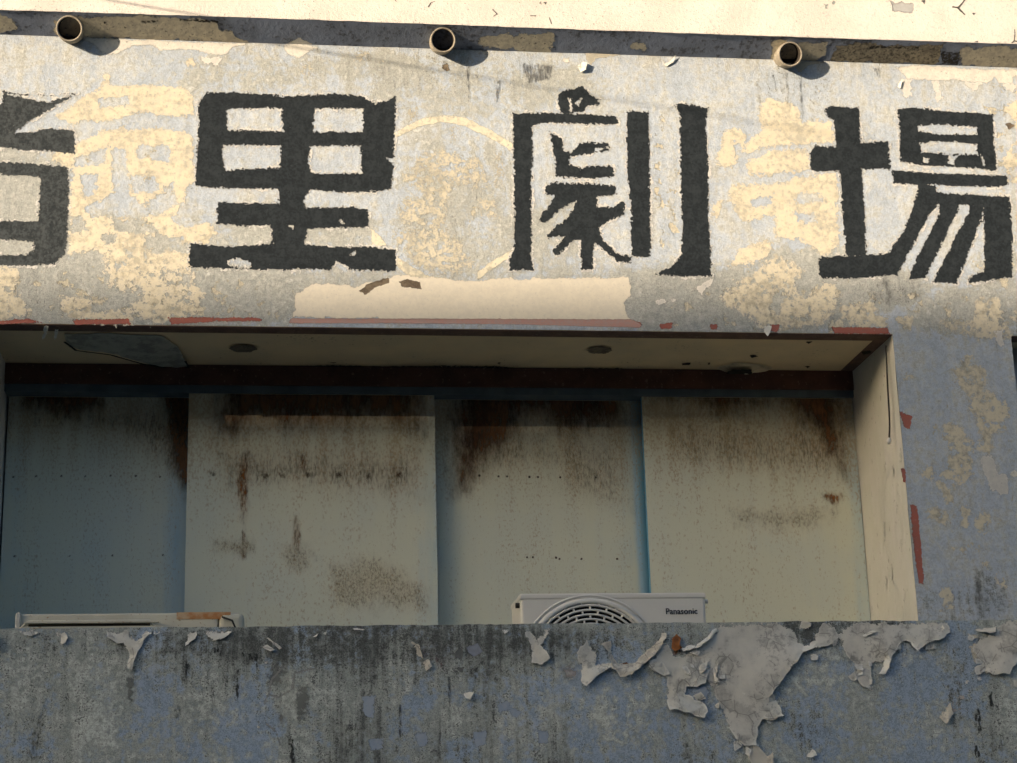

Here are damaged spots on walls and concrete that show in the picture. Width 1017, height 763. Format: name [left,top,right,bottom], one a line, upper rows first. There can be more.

peeling [770,39,1017,169]
peeling [0,74,262,368]
peeling [711,98,890,336]
peeling [695,278,713,295]
peeling [969,295,1017,341]
peeling [899,354,1017,589]
peeling [106,630,160,670]
peeling [185,630,231,646]
damp [296,676,312,720]
peeling [577,587,955,763]
peeling [939,620,1017,724]